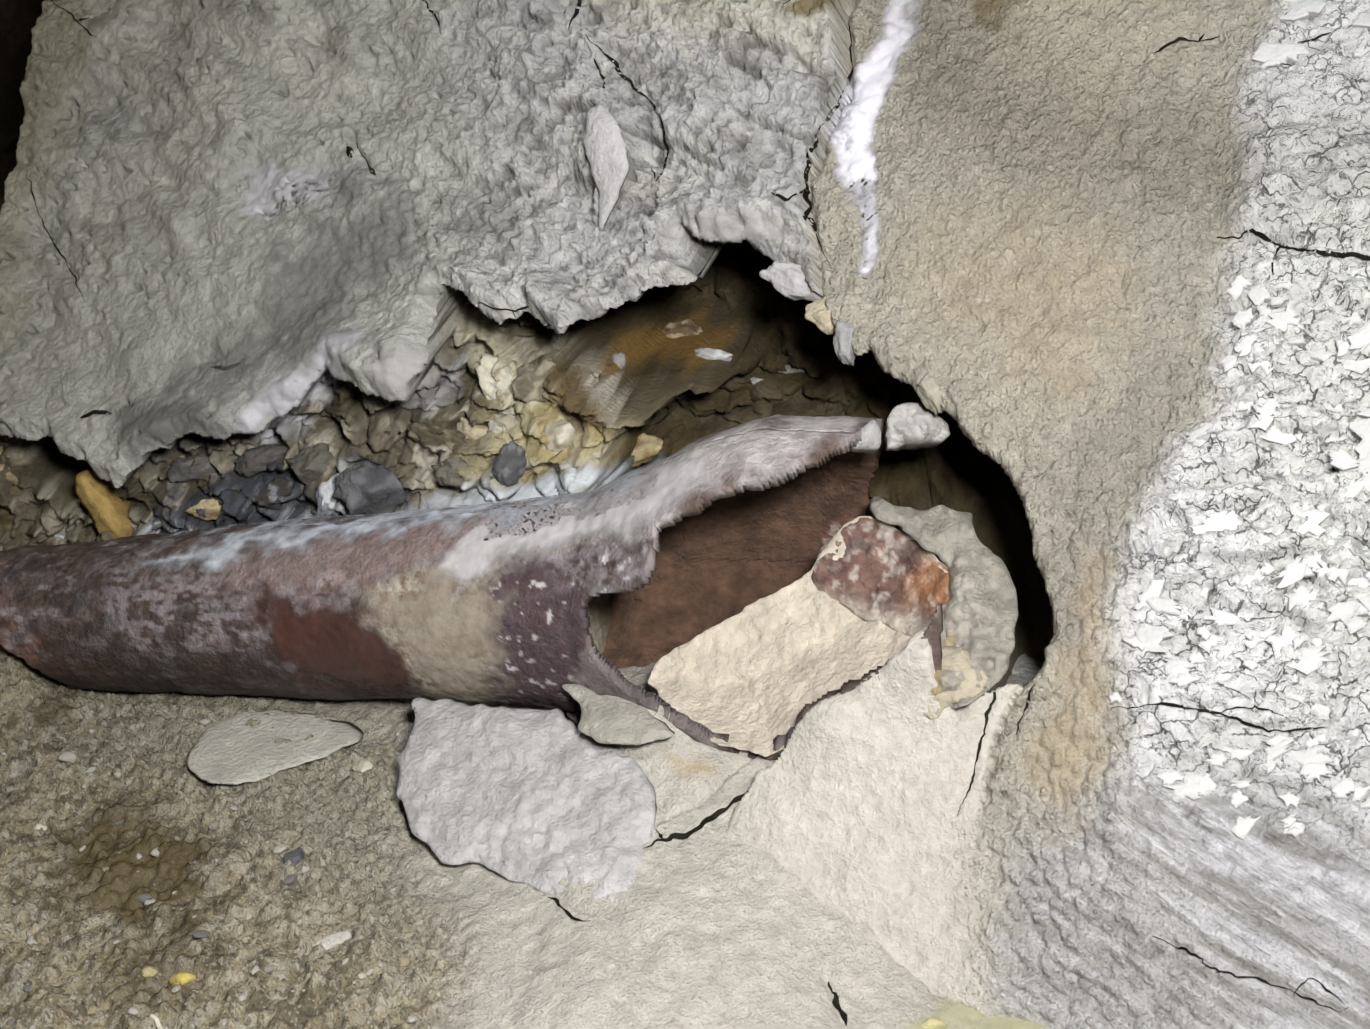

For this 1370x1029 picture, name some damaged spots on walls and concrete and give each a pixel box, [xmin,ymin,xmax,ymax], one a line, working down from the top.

peeling [1252,42,1310,68]
peeling [1279,0,1343,23]
damp [830,0,916,273]
crack [1217,228,1370,275]
peeling [1218,274,1370,376]
spalling [0,284,547,550]
spalling [850,420,881,453]
peeling [1123,398,1370,687]
rust [256,584,418,698]
peeling [562,684,675,745]
peeling [1109,692,1123,704]
peeling [1157,691,1370,839]